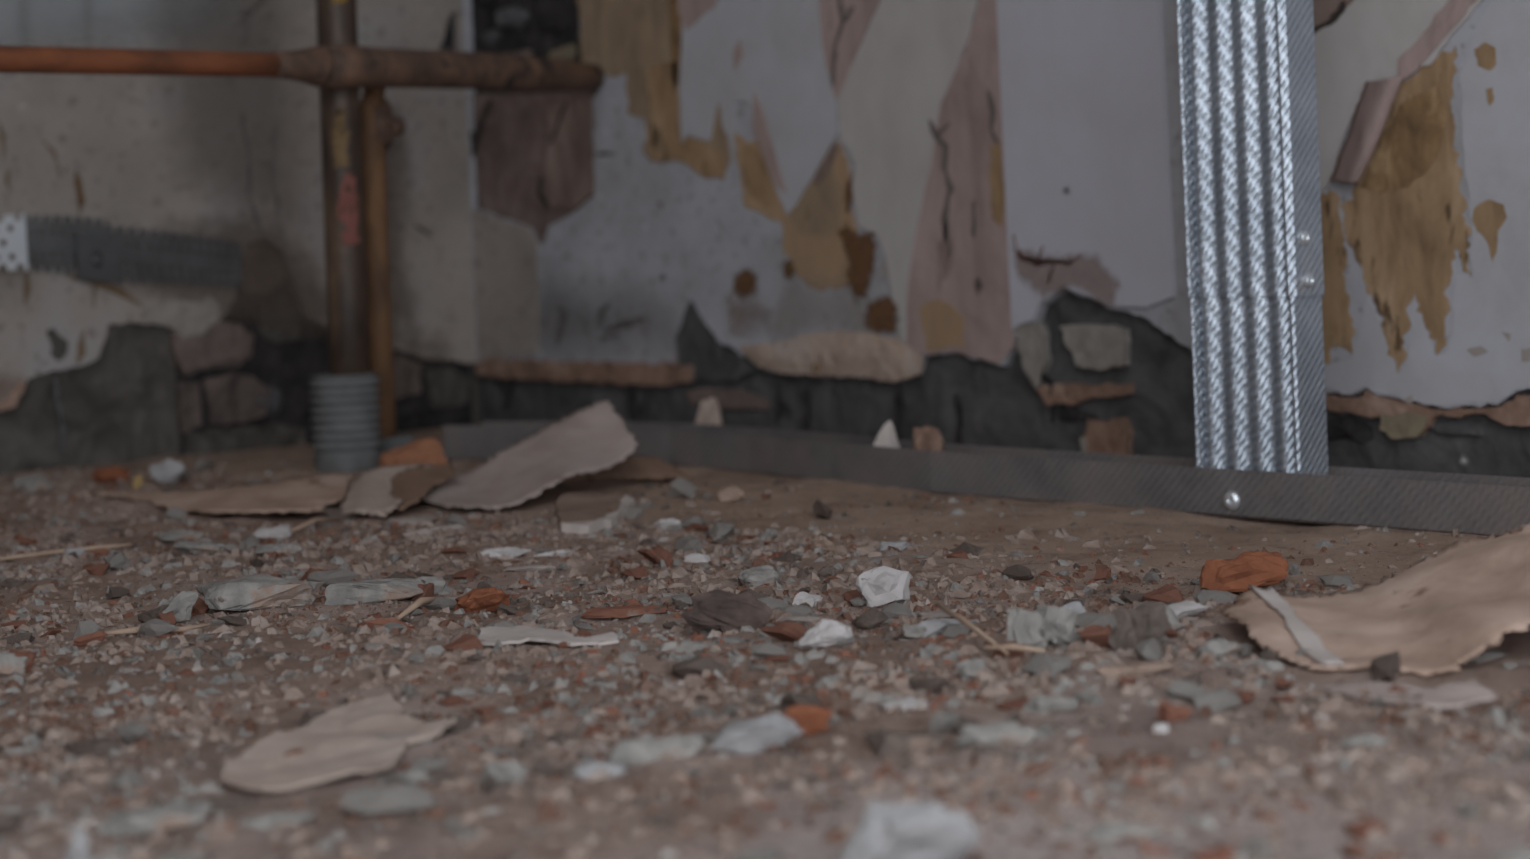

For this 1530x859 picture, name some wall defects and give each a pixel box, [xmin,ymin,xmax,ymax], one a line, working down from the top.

flaking render [439,0,582,62]
flaking render [470,89,599,243]
peeling [1325,0,1530,478]
flaking render [0,296,329,491]
flaking render [393,290,1196,458]